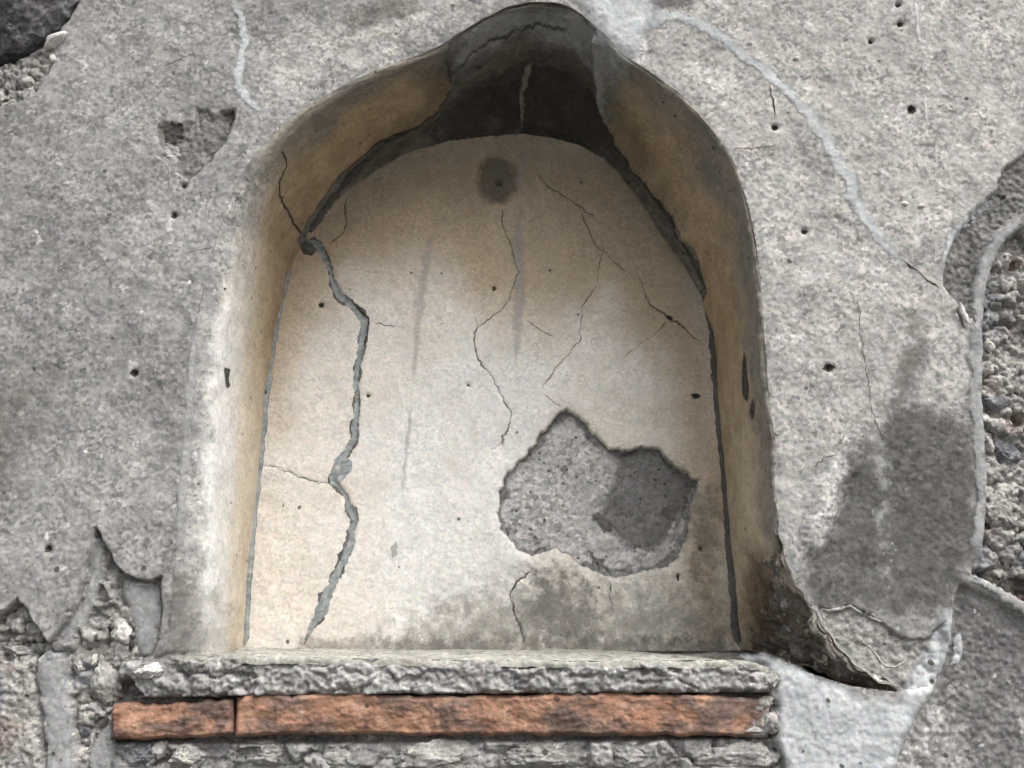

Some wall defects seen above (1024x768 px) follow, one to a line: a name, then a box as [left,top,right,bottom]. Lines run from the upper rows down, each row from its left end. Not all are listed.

spalling [152,109,234,197]
crack [460,22,564,67]
spalling [0,534,163,768]
crack [244,152,395,645]
crack [473,210,519,449]
spalling [498,410,697,578]
crack [528,175,741,646]
spalling [753,518,940,692]
water stain [807,405,977,613]
spalling [958,224,1024,602]